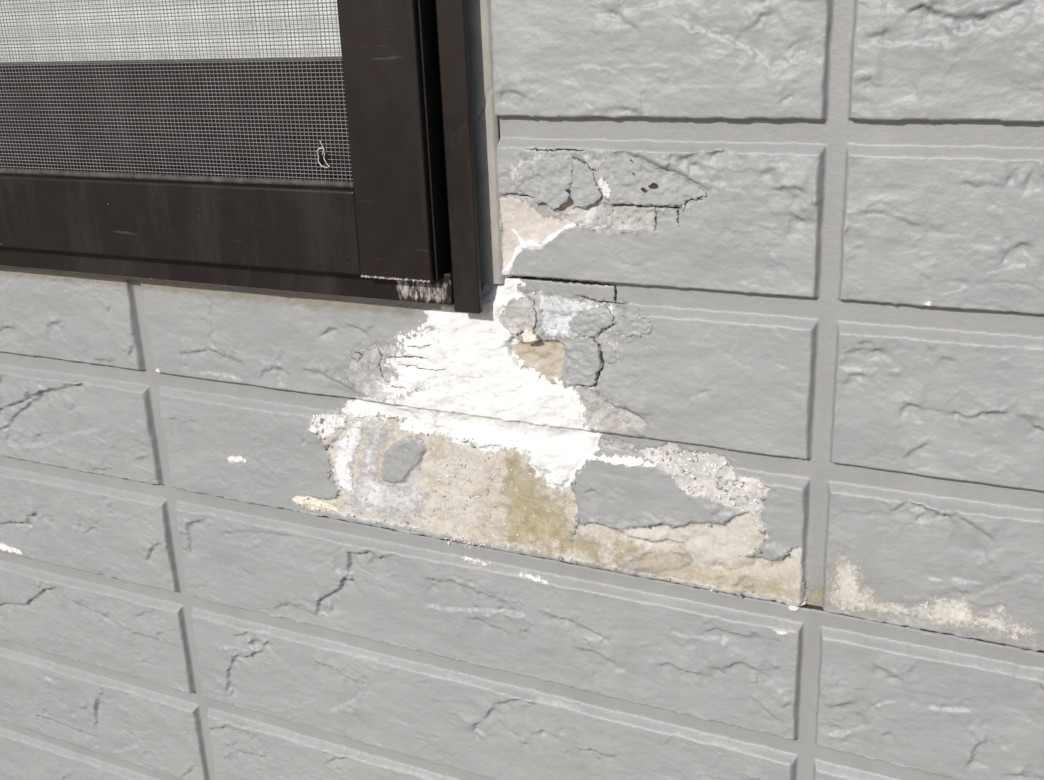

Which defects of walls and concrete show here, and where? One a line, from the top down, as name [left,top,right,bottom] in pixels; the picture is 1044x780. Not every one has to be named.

peeling [499,150,707,270]
spalling [311,288,808,604]